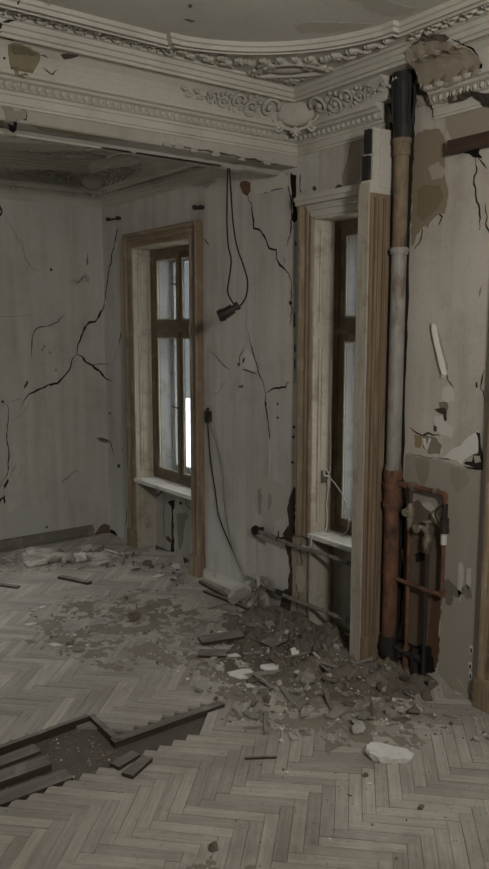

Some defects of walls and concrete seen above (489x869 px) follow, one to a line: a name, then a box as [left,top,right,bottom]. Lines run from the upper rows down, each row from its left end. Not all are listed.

crack [0,0,20,41]
flaking render [8,43,41,79]
flaking render [405,34,489,108]
crack [473,158,489,232]
crack [0,229,121,503]
crack [209,305,290,475]
flaking render [280,487,308,616]
peeling [404,385,483,699]